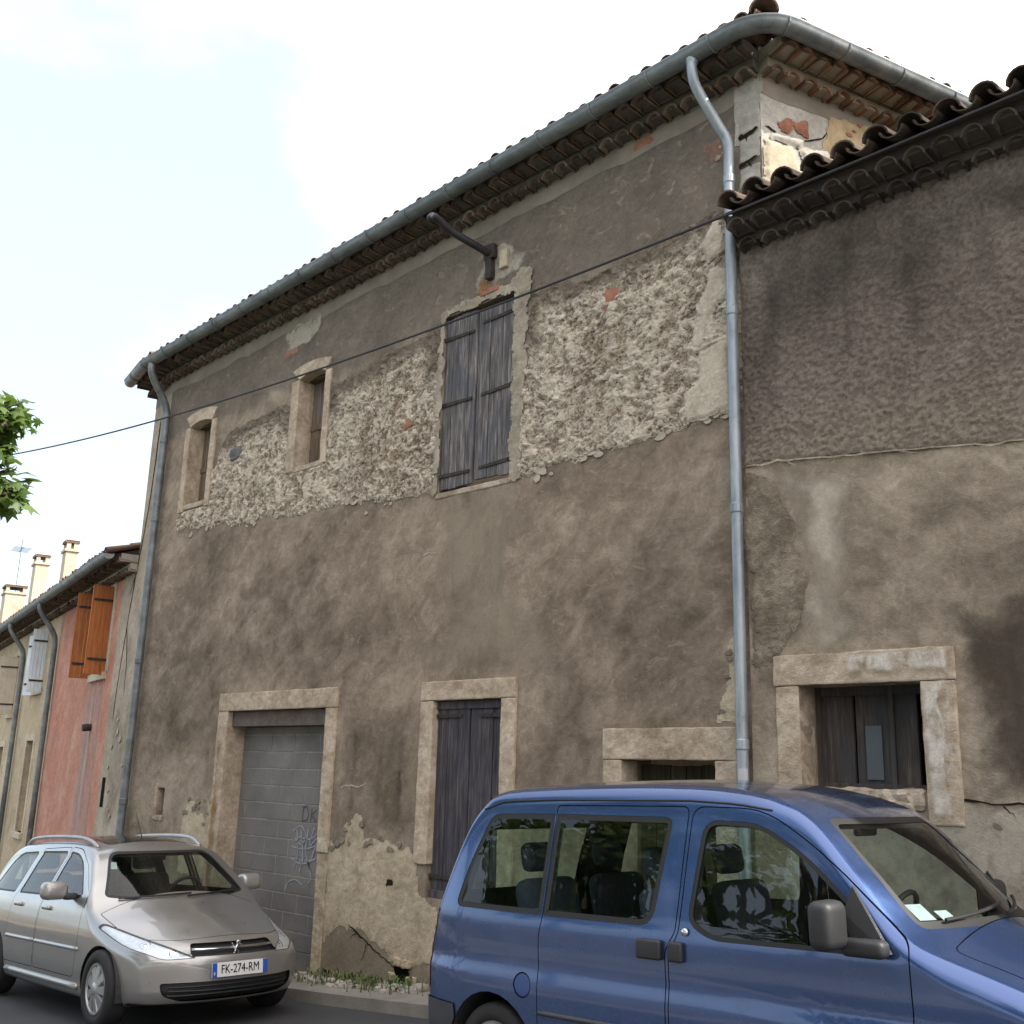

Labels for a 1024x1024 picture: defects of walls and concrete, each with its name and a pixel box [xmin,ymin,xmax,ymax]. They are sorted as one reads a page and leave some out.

flaking render [763,117,870,181]
flaking render [476,243,524,292]
flaking render [285,312,322,357]
flaking render [517,210,744,483]
flaking render [174,323,442,538]
crack [746,439,1024,467]
flaking render [323,813,437,986]
crack [322,924,395,978]